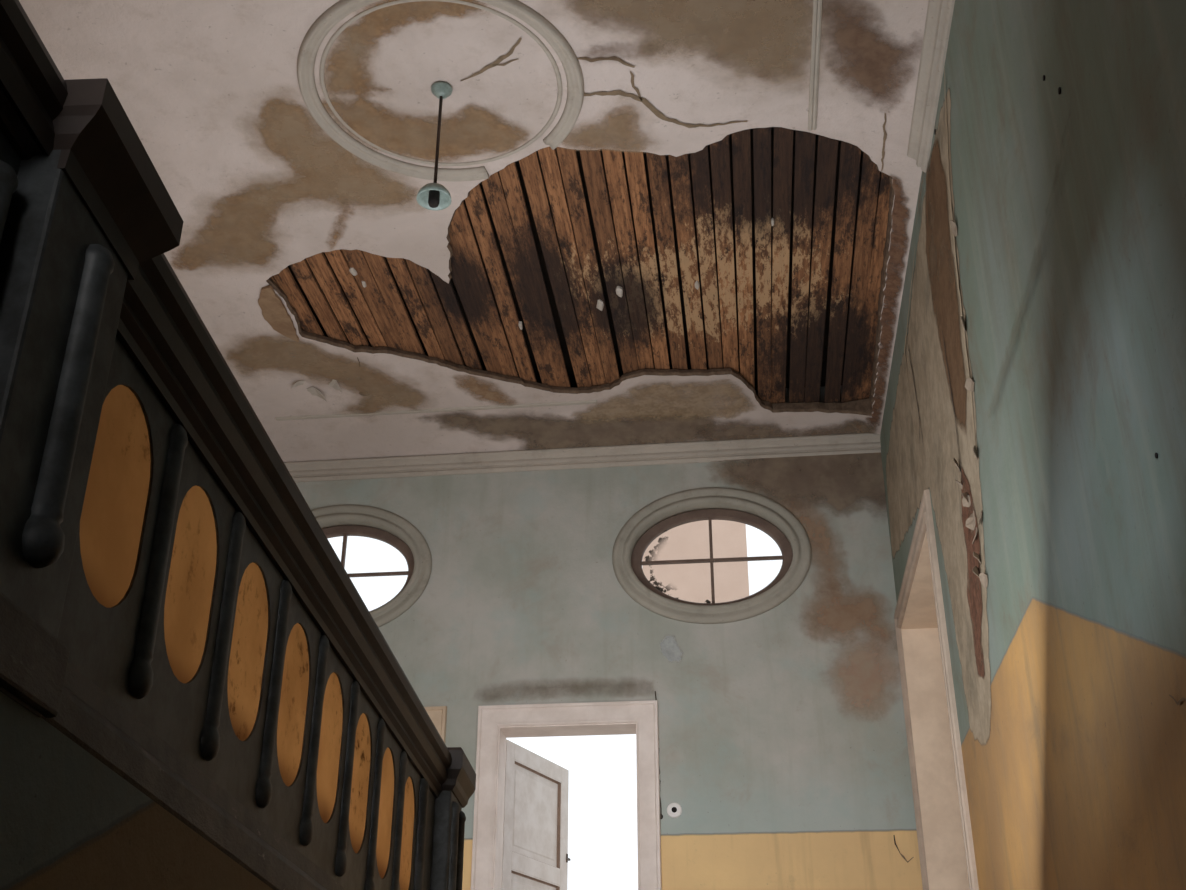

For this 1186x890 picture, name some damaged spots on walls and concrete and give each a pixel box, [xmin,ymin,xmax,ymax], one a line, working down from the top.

damp [322,0,527,160]
crack [460,38,522,81]
damp [563,110,643,152]
crack [577,56,747,128]
damp [575,0,809,78]
damp [822,0,912,99]
damp [174,99,414,270]
spalling [266,146,894,423]
damp [443,177,909,450]
damp [228,337,422,414]
peeling [886,67,991,745]